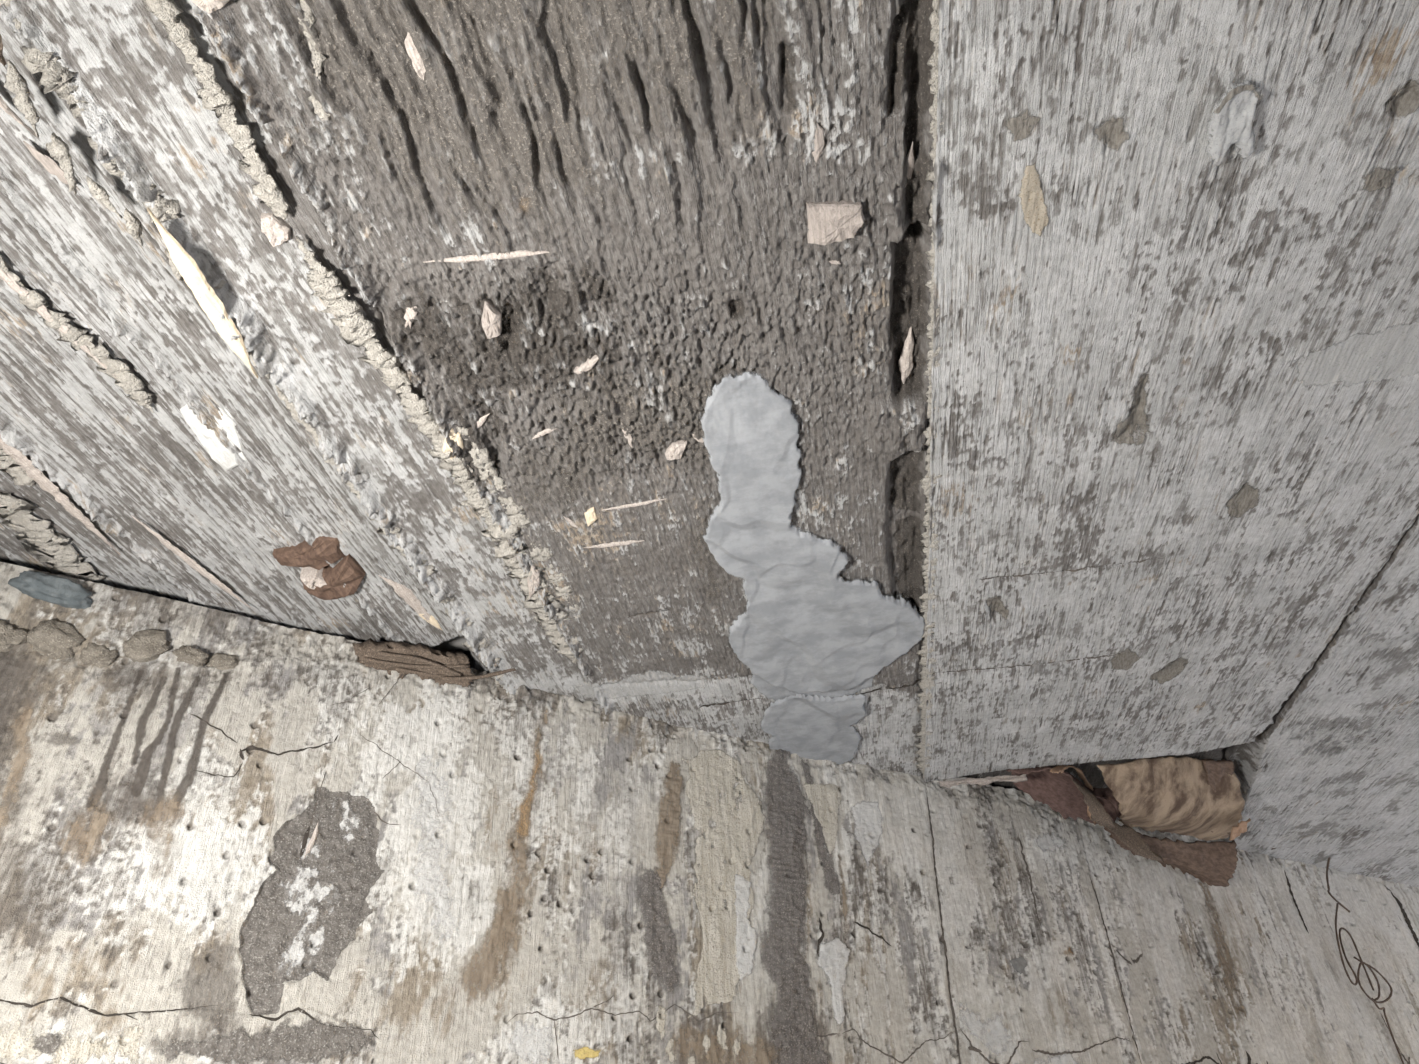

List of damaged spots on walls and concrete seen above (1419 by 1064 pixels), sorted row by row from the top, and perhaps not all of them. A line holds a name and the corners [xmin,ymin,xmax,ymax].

water stain [91,666,229,818]
crack [0,997,194,1020]
spalling [151,787,384,1064]
water stain [637,749,882,1064]